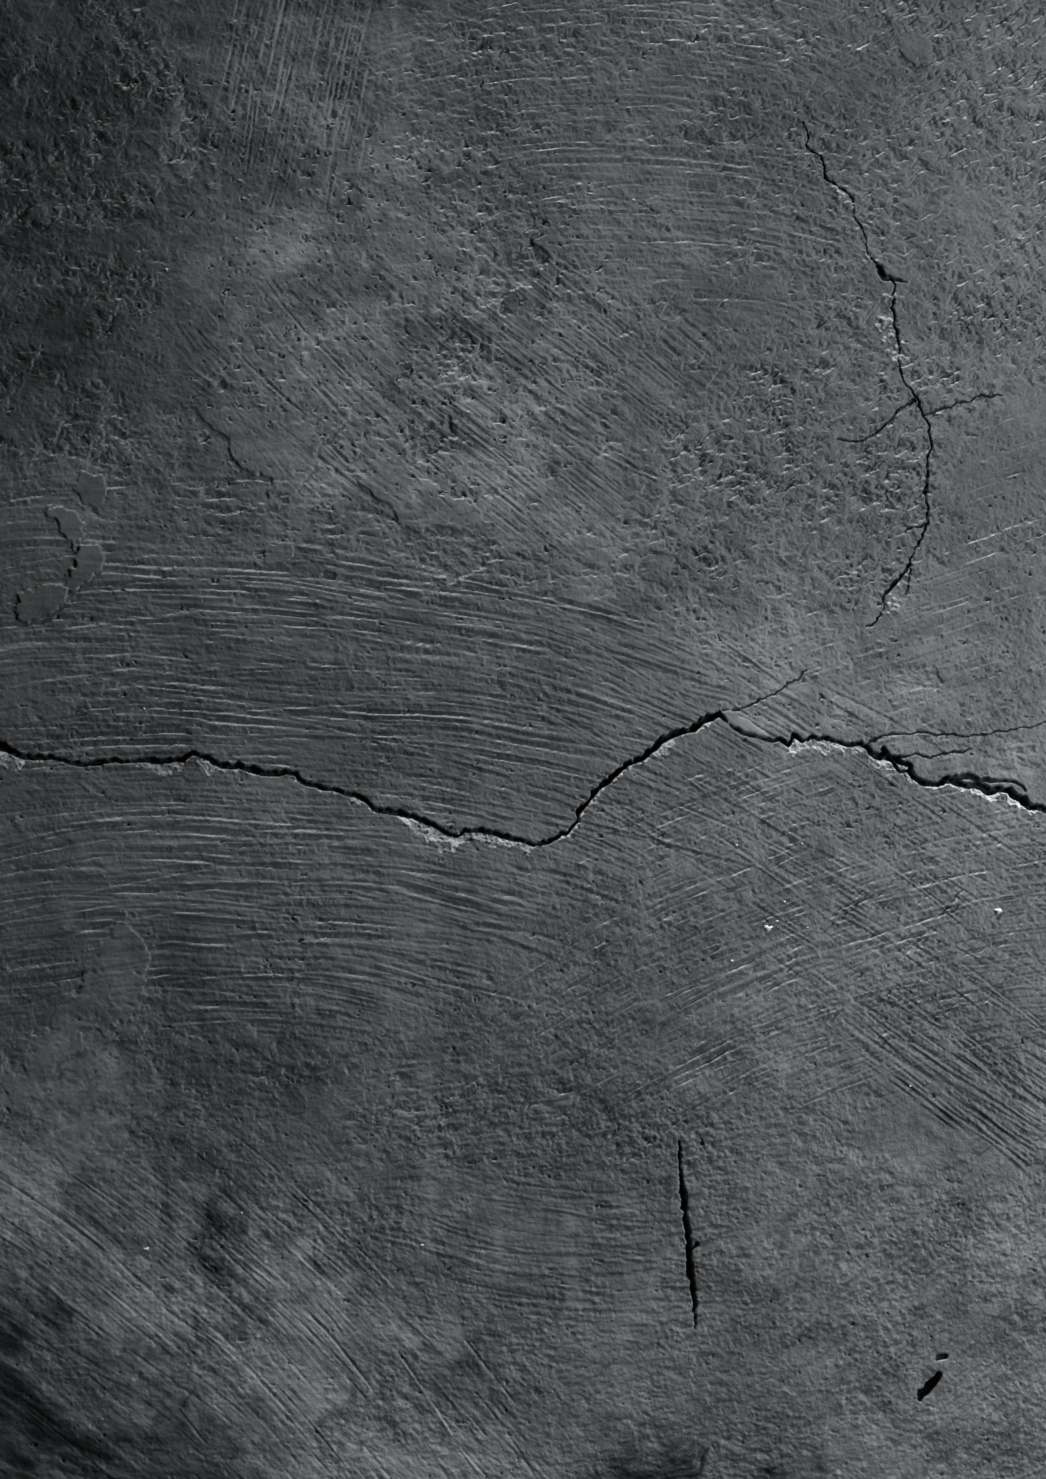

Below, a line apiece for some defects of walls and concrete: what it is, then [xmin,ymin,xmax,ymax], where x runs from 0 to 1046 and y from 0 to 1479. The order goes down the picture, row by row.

crack [802,121,1002,627]
crack [0,670,1046,856]